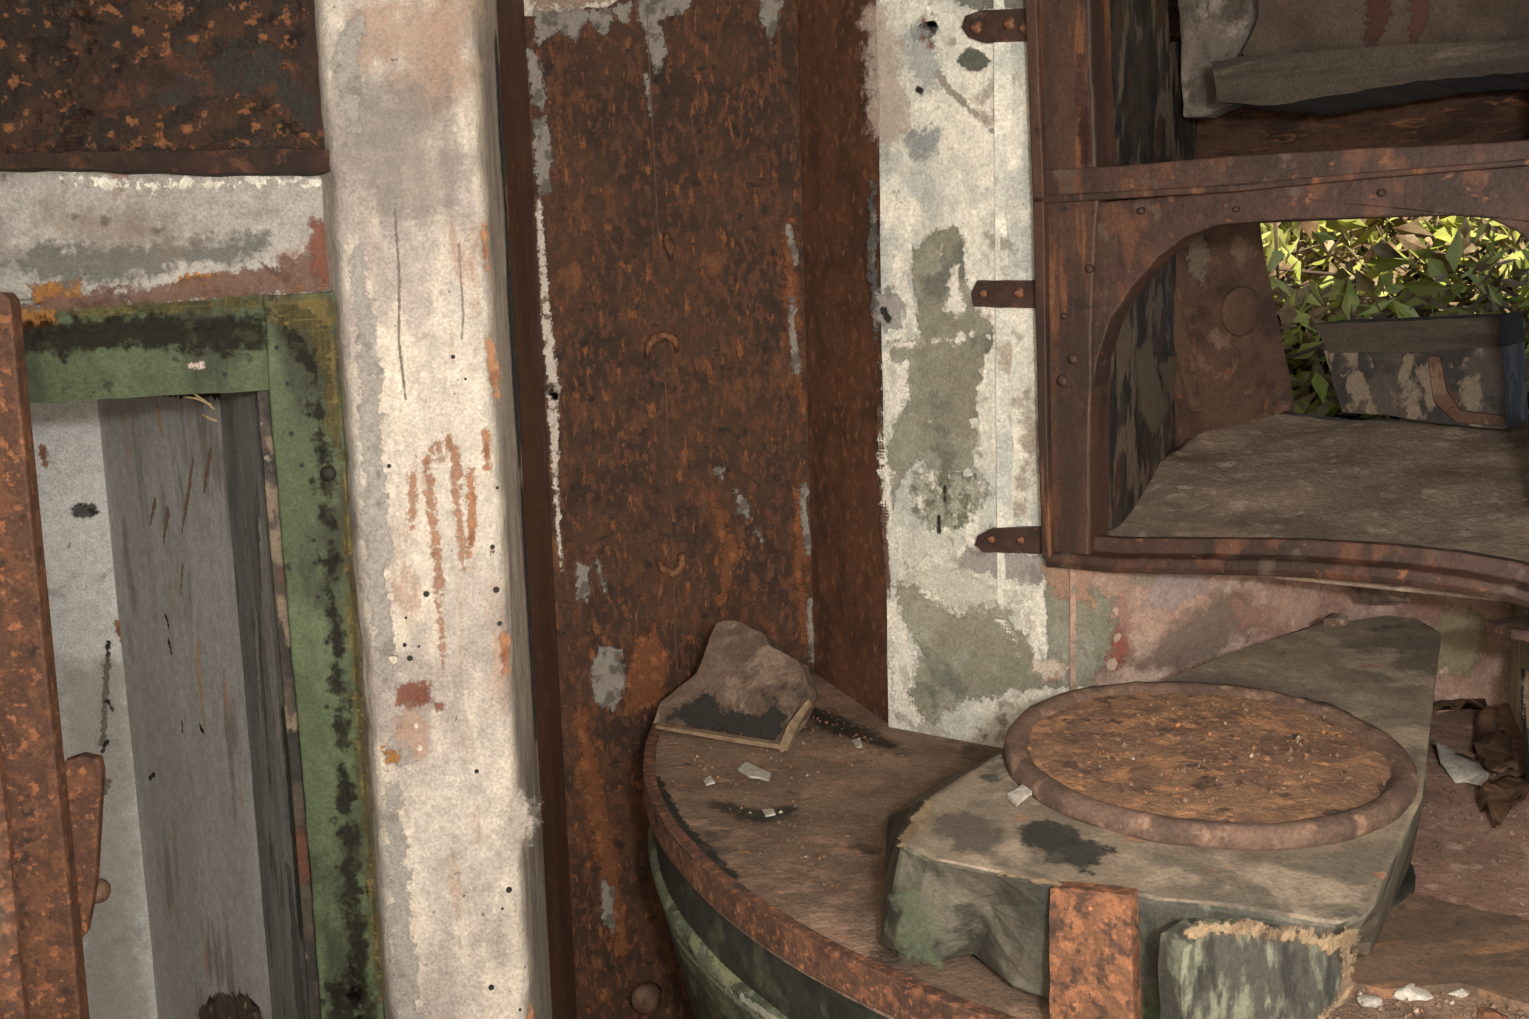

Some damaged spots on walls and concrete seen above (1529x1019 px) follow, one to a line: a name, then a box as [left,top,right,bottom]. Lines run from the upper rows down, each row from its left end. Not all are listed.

leakage [860,5,941,161]
peeling [58,172,322,197]
leakage [984,231,1014,254]
rust [485,337,501,398]
rust [39,443,49,468]
leakage [877,427,896,537]
rust [406,429,492,669]
rust [789,478,813,650]
rust [396,680,444,758]
rust [620,619,674,716]
leakage [886,627,932,732]
rust [572,707,635,963]